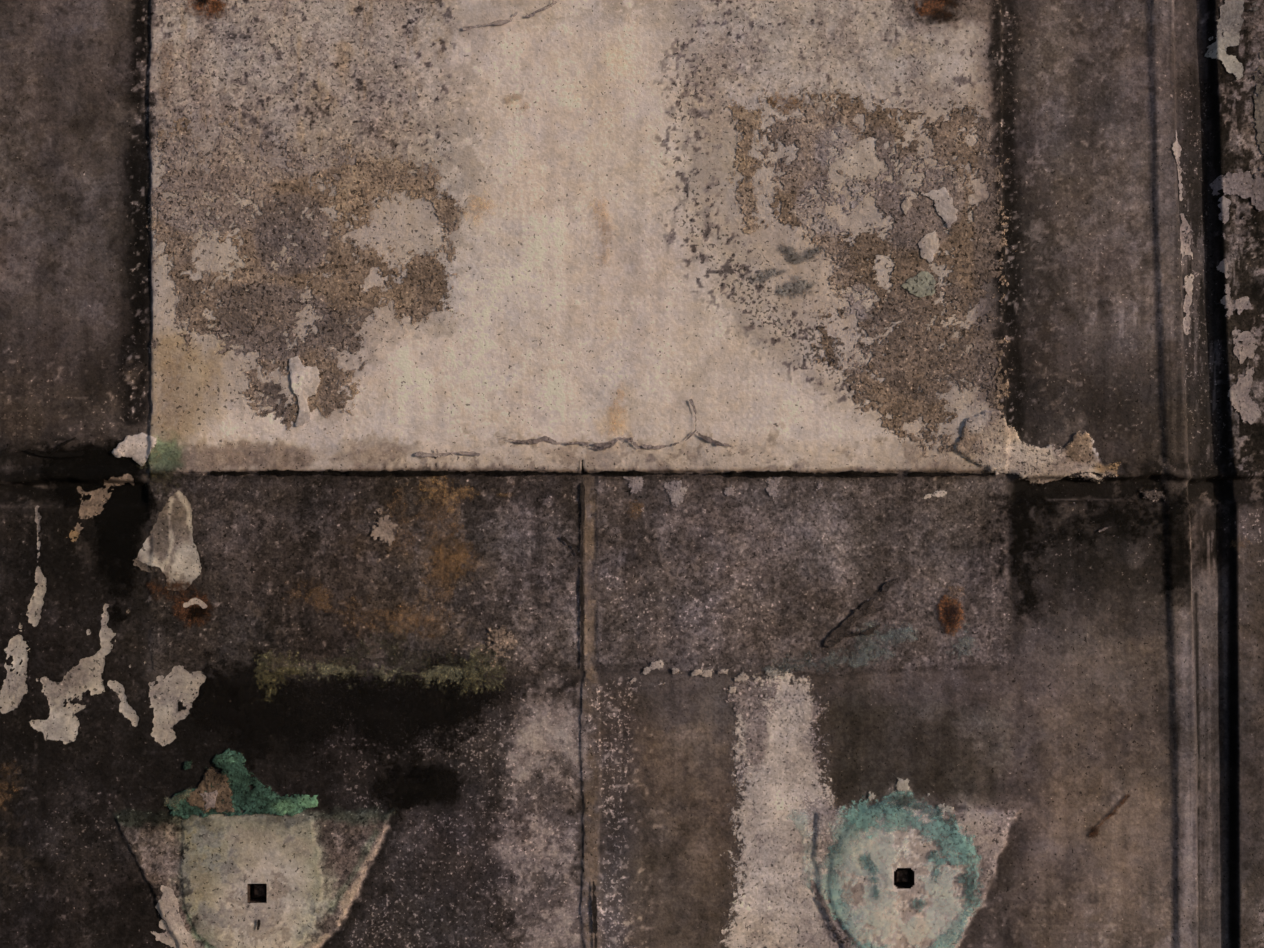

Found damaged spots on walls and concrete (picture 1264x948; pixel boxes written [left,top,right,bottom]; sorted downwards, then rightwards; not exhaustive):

corrosion [185,0,225,19]
corrosion [915,0,960,23]
peeling [1204,0,1264,239]
spalling [146,112,466,434]
spalling [728,85,1121,484]
peeling [1216,258,1261,424]
peeling [66,433,157,542]
spalling [1140,488,1167,502]
peeling [0,490,206,746]
corrosion [147,577,212,627]
damp [166,625,527,820]